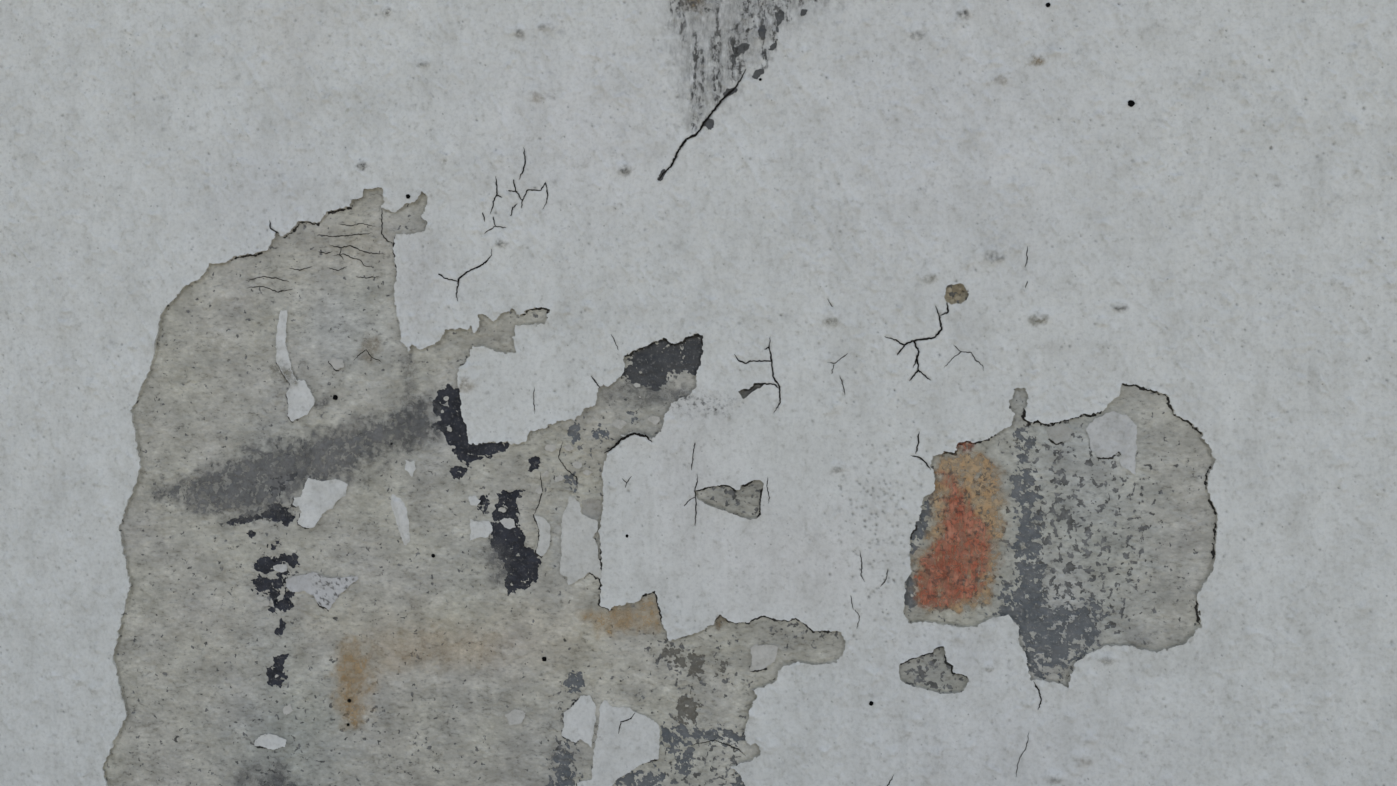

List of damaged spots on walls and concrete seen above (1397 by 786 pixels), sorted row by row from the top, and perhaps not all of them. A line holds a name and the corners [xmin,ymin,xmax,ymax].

leakage [670,0,788,107]
crack [657,9,807,181]
crack [438,147,548,301]
crack [886,303,984,380]
spalling [944,283,969,305]
peeling [103,187,846,786]
corrosion [914,442,1003,613]
peeling [903,383,1218,688]
peeling [899,646,969,694]